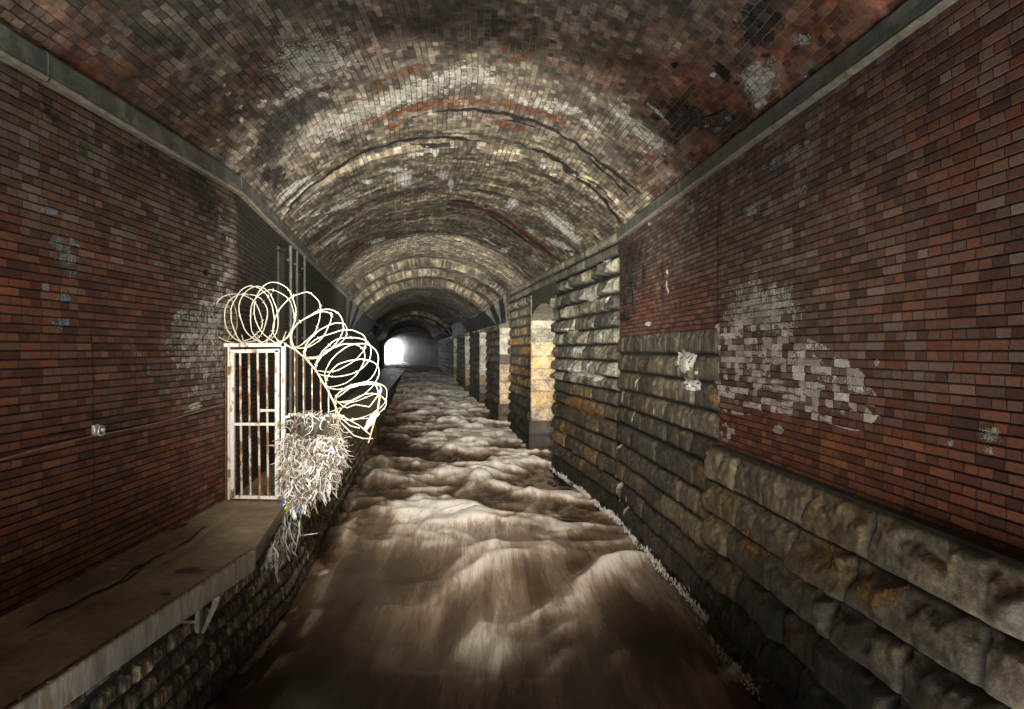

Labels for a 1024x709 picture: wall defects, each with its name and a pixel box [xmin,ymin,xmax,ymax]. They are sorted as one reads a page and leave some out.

rust [323,97,570,138]
damp [609,104,669,155]
crack [279,108,639,225]
damp [47,234,83,277]
damp [42,283,72,301]
damp [164,215,234,400]
damp [715,271,880,441]
damp [980,427,1000,454]